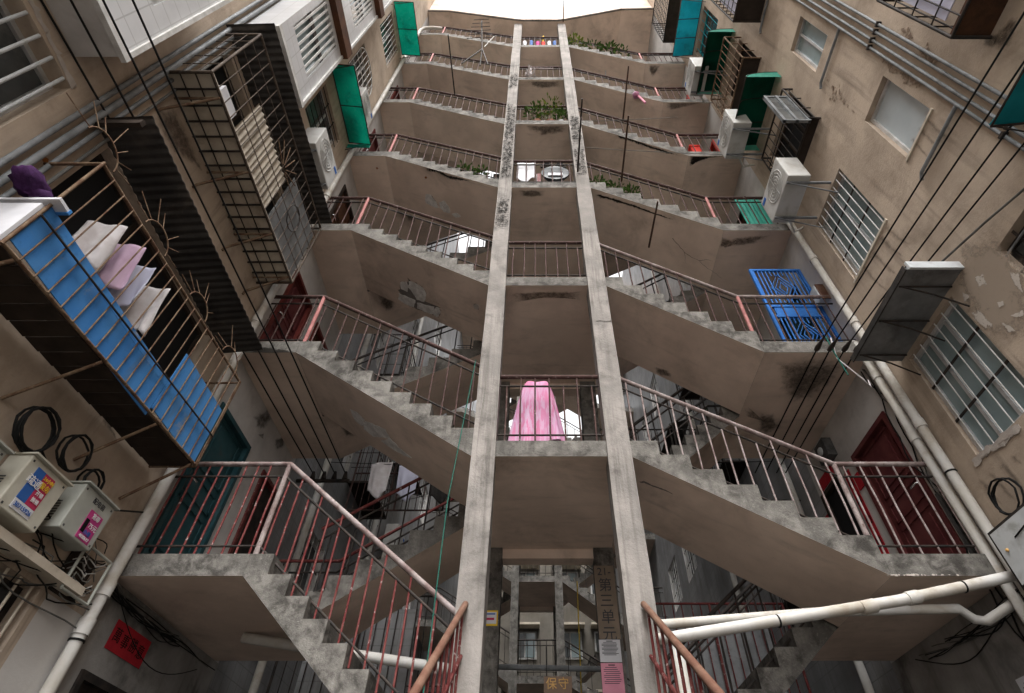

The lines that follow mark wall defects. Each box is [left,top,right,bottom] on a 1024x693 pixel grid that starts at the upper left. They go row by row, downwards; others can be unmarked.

peeling [960,241,1024,336]
peeling [972,424,1021,467]